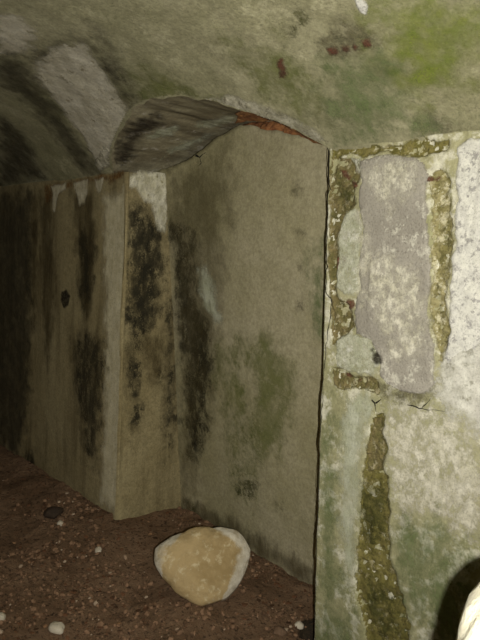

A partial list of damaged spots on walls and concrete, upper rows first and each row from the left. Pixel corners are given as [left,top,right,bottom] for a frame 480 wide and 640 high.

water stain [74,171,221,509]
crack [322,150,335,385]
crack [314,403,323,630]
spalling [355,413,411,640]